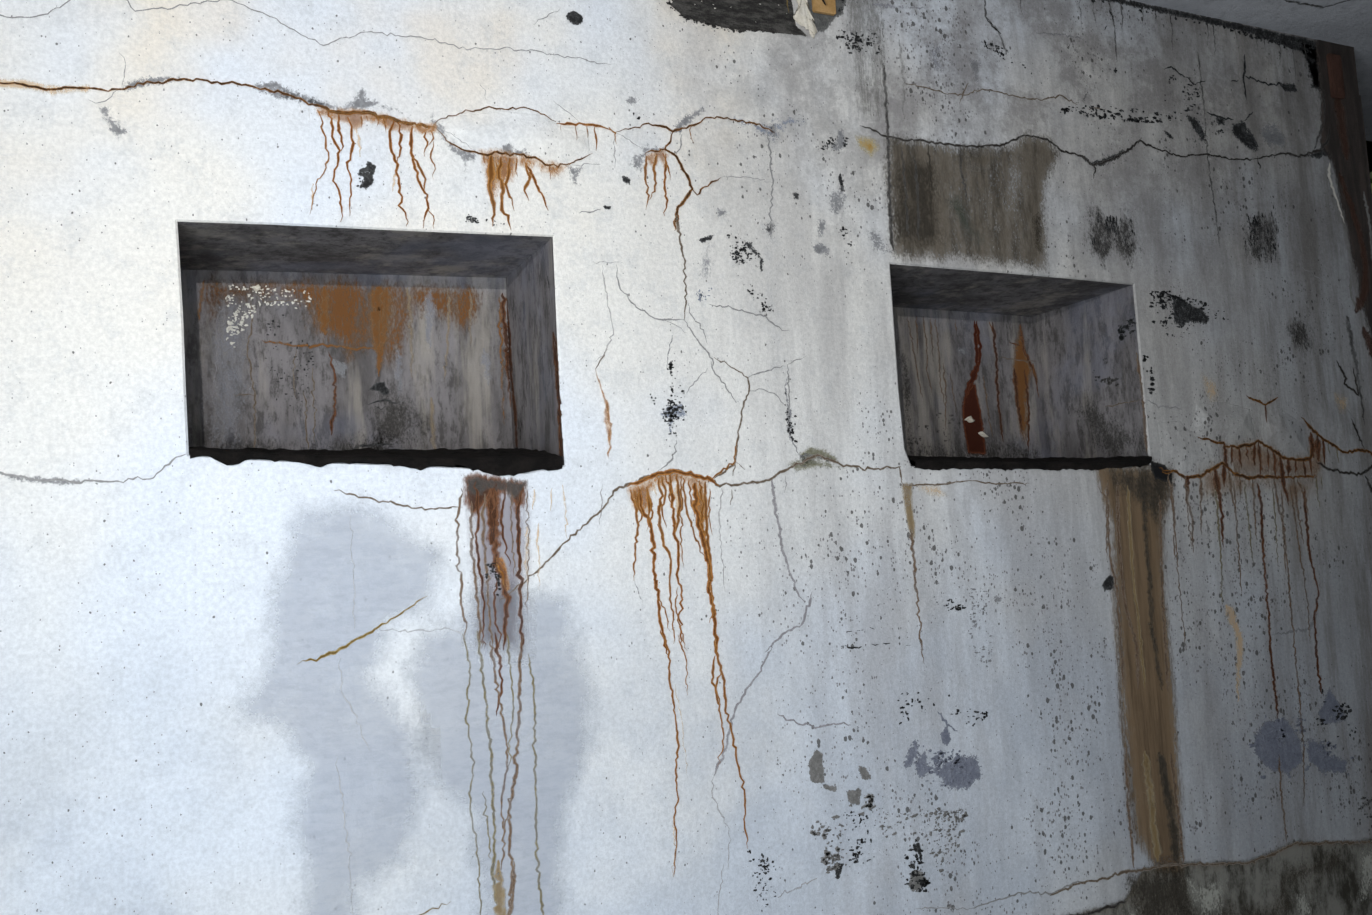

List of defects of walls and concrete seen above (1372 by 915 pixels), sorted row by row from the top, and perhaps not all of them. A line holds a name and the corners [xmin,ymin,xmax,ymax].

crack [127,0,611,65]
rust [310,109,436,228]
rust [483,153,561,229]
leakage [813,100,1058,269]
crack [831,83,1331,179]
crack [0,58,901,915]
leakage [901,316,1037,459]
crack [1160,360,1372,493]
rust [455,473,568,915]
rust [627,443,748,877]
rust [1097,432,1339,874]
leakage [1078,797,1372,915]